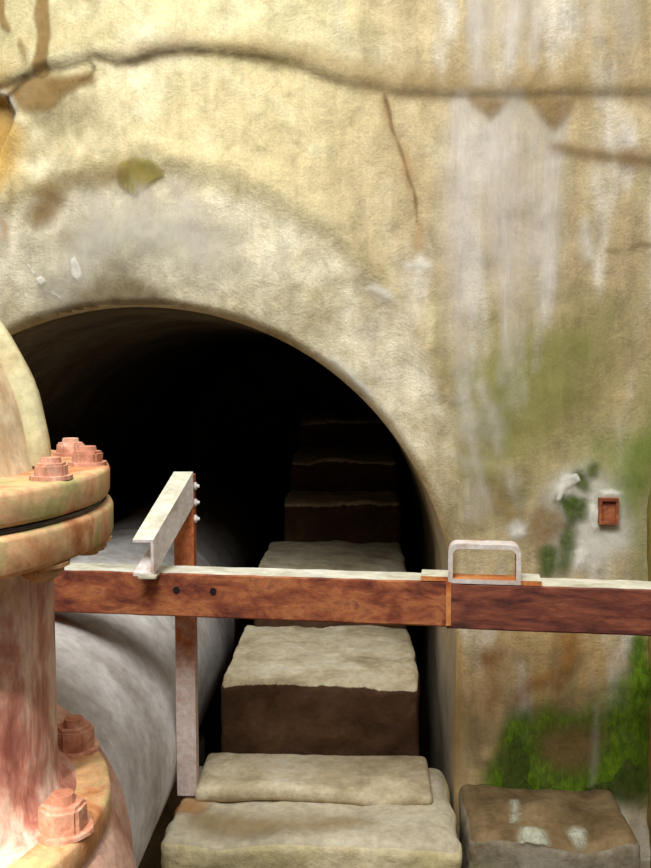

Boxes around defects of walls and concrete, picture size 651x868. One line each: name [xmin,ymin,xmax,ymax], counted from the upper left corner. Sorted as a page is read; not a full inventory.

water stain [0,0,9,30]
water stain [11,0,91,109]
water stain [118,158,163,195]